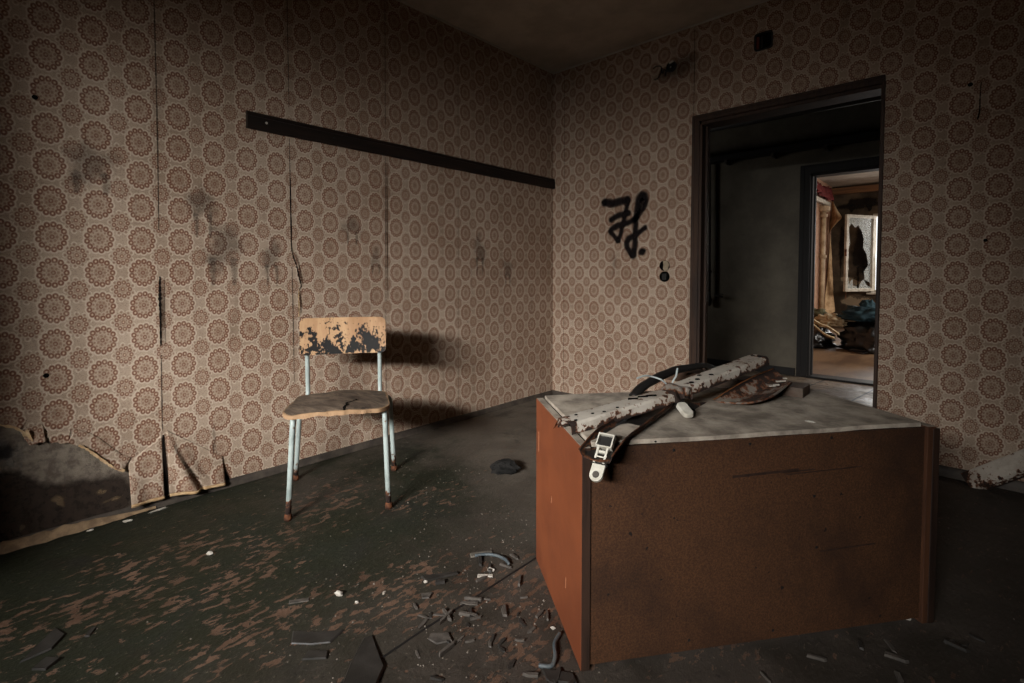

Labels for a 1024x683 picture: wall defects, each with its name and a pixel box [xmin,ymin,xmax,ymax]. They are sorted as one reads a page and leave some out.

crack [290,180,304,317]
flaking render [0,426,130,486]